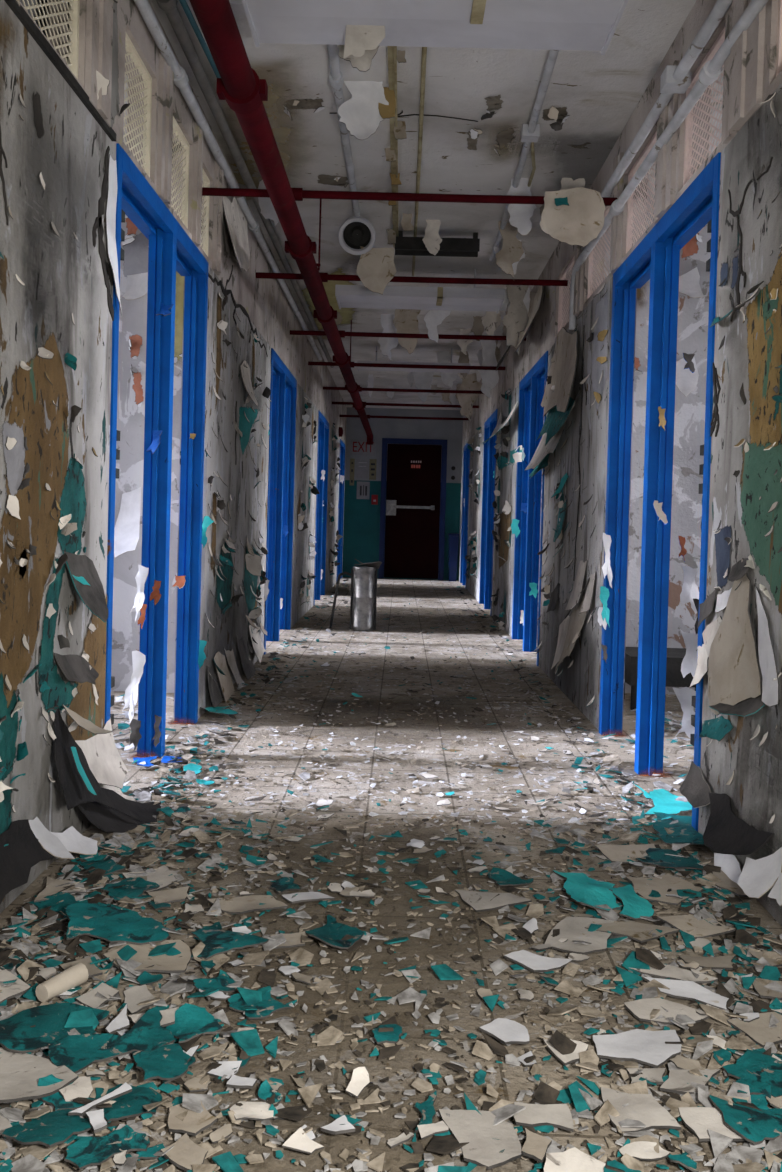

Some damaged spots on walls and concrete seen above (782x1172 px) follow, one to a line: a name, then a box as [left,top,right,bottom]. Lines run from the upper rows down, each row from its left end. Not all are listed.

spalling [19,92,45,139]
peeling [96,0,130,127]
peeling [211,293,272,488]
peeling [542,283,608,476]
peeling [733,244,782,615]
peeling [0,332,107,847]
peeling [201,448,268,661]
peeling [534,483,597,676]
peeling [750,724,778,748]